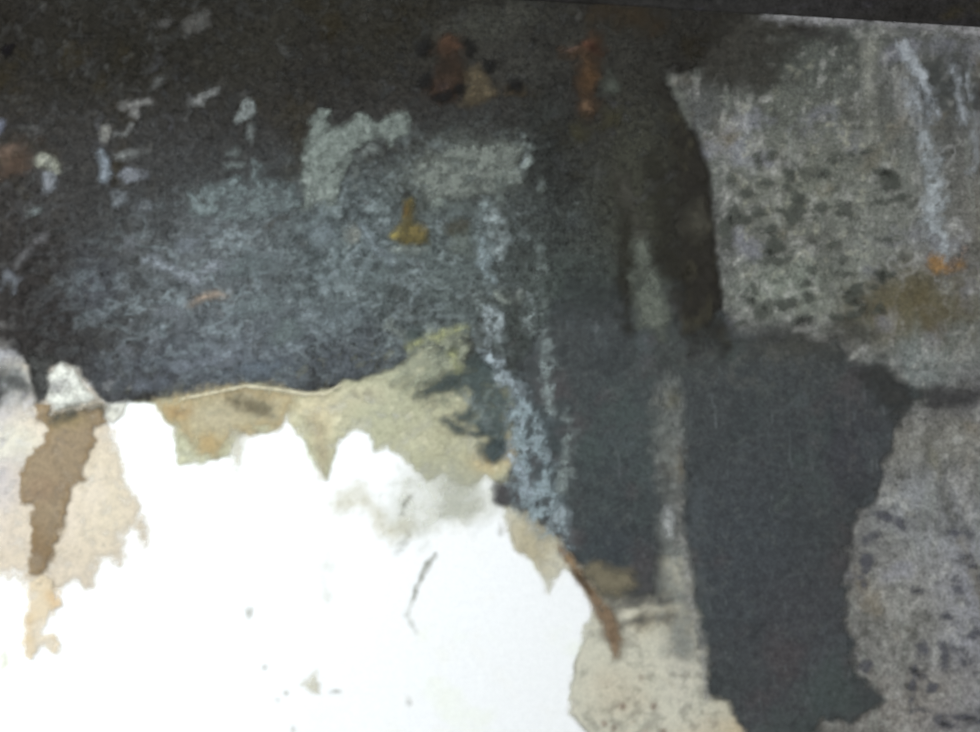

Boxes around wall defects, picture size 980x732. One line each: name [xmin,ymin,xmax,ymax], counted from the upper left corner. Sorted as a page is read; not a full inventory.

corrosion [417,34,496,104]
corrosion [567,31,618,116]
leakage [805,17,858,25]
leakage [863,21,980,97]
leakage [0,0,824,455]
peeling [143,256,271,303]
peeling [135,339,520,487]
leakage [927,386,980,408]
leakage [19,404,106,575]
peeling [0,361,147,589]
leakage [424,282,922,732]
leakage [22,576,61,659]